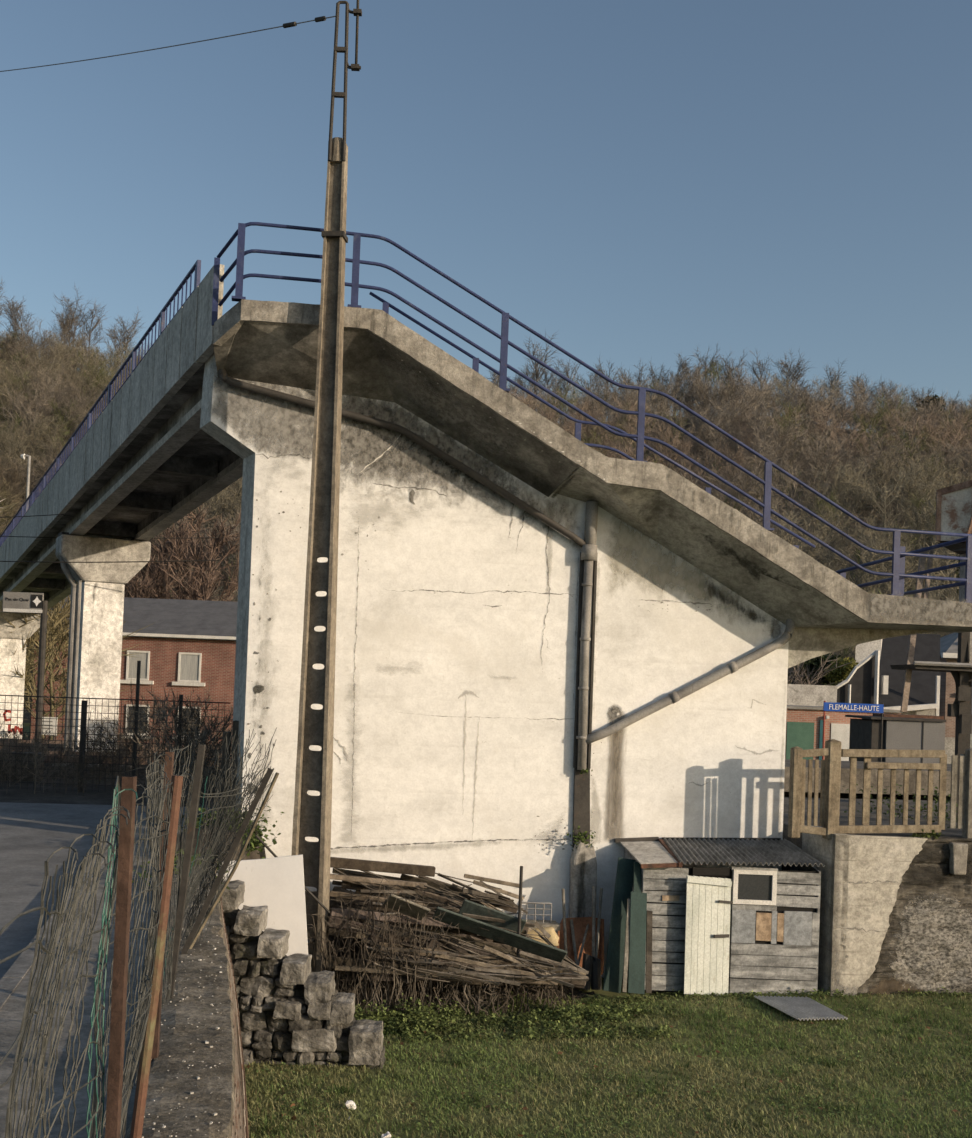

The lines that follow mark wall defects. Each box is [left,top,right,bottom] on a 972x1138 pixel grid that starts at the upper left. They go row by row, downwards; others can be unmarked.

crack [357,434,446,505]
water stain [340,366,576,528]
water stain [611,523,781,638]
water stain [705,536,799,589]
water stain [606,714,624,840]
water stain [908,846,972,883]